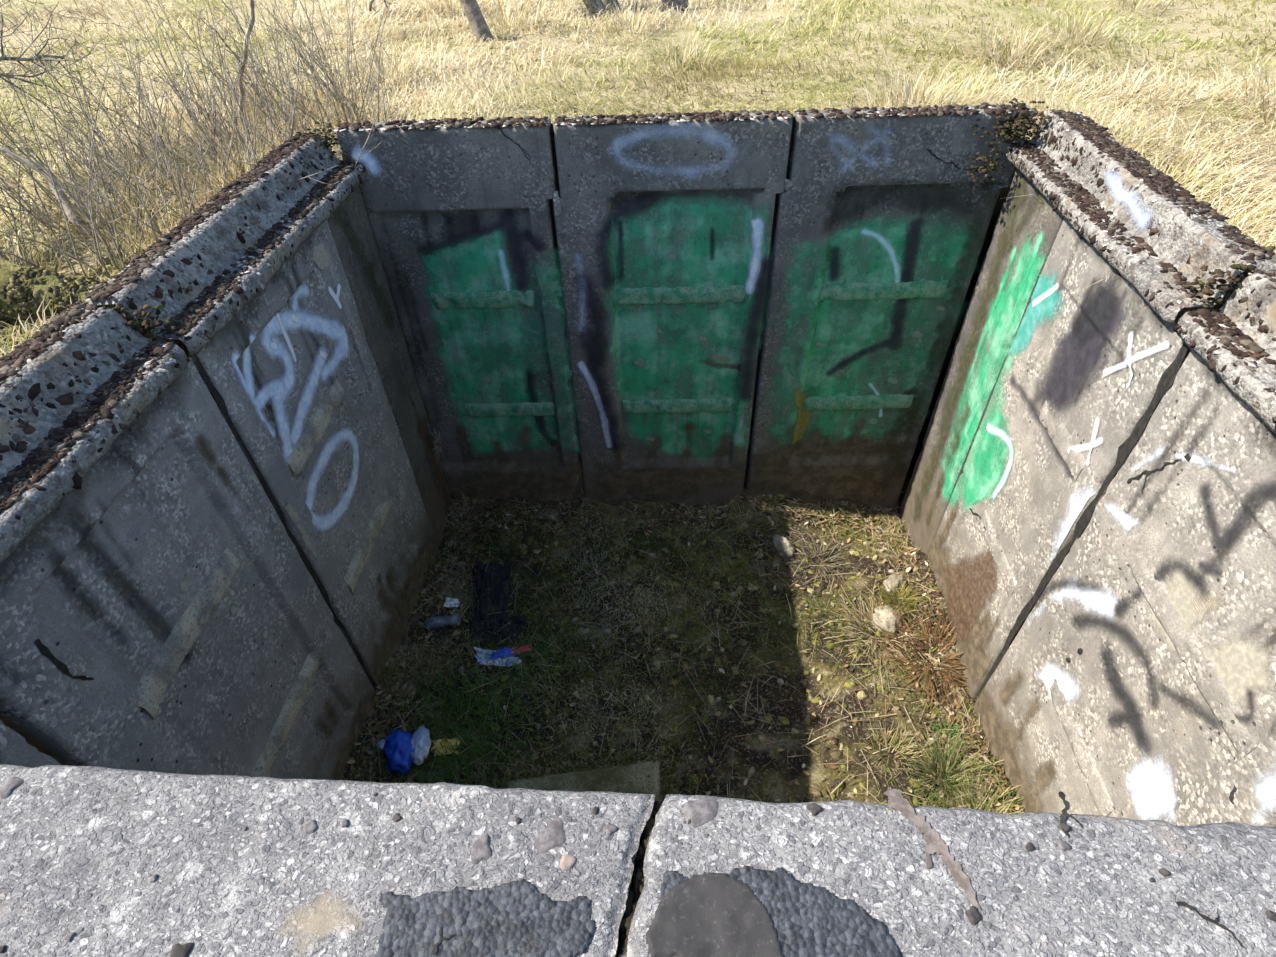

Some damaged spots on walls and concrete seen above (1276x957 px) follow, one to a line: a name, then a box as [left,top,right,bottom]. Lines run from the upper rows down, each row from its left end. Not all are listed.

crack [1127,458,1182,490]